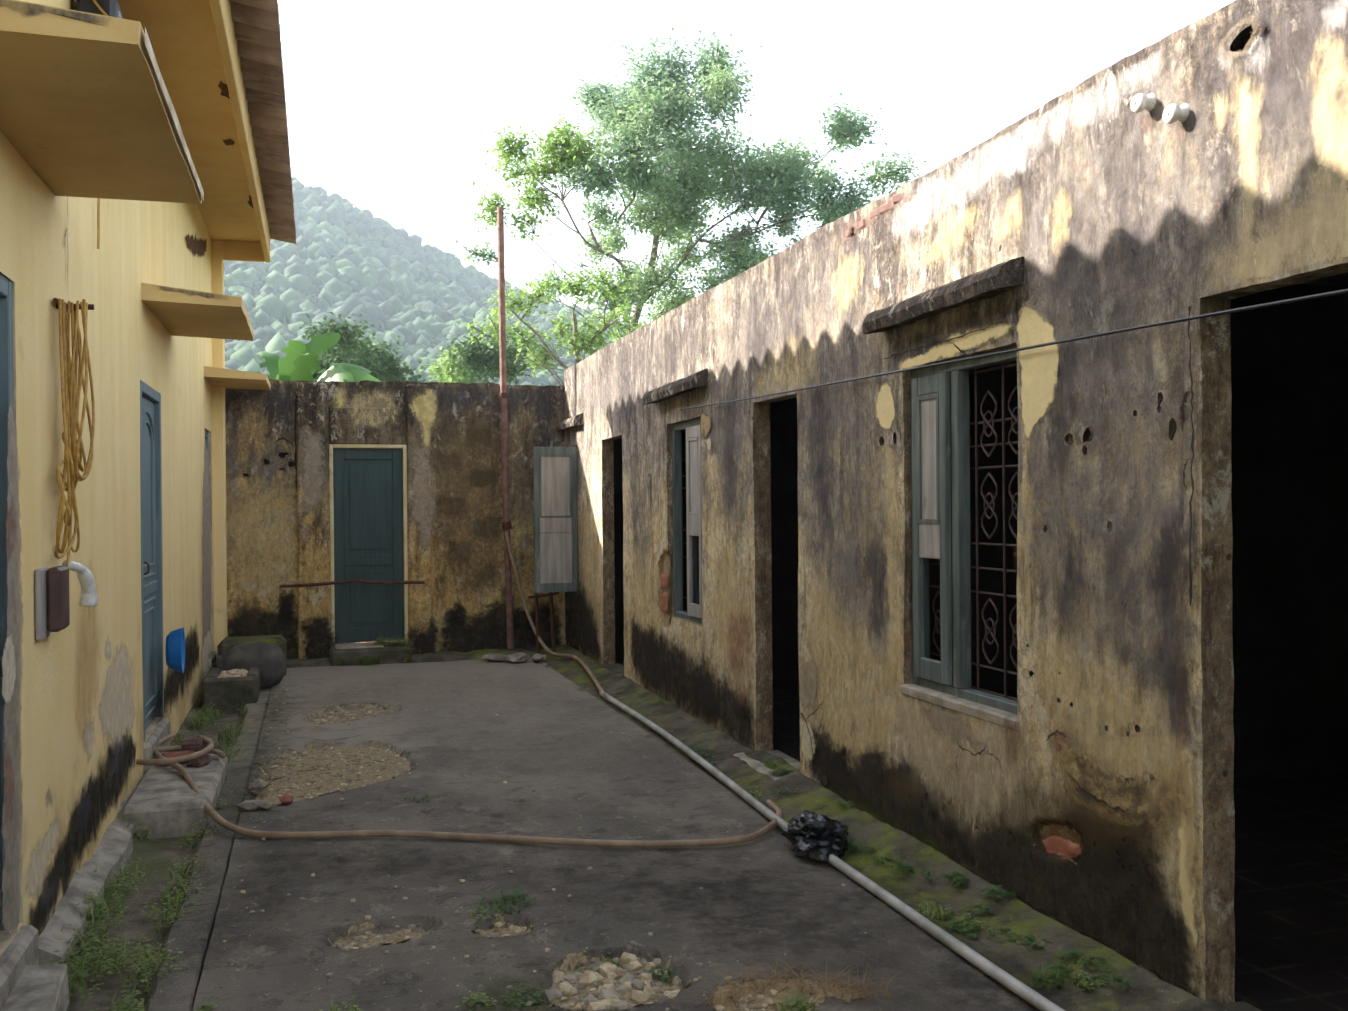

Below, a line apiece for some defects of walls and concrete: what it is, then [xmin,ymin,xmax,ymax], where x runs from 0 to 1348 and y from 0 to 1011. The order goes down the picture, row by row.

damp [1002,123,1189,314]
damp [1200,0,1348,243]
damp [227,591,337,659]
damp [630,618,754,747]
damp [1037,326,1195,746]
damp [30,732,136,937]
damp [810,730,1199,996]
spalling [1040,821,1083,860]